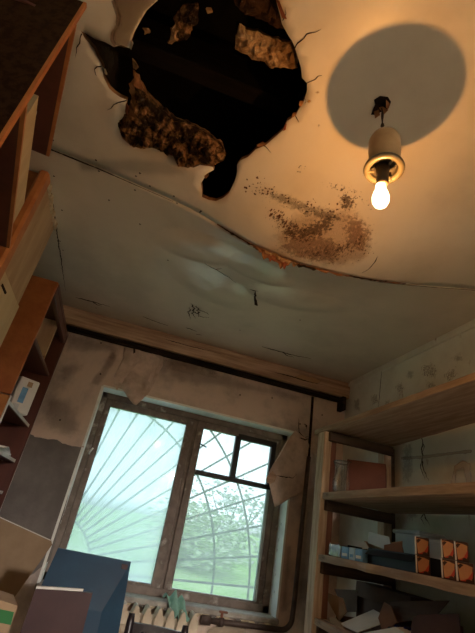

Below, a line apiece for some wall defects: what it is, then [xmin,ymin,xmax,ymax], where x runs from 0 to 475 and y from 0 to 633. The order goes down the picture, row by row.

flaking render [0,434,84,575]